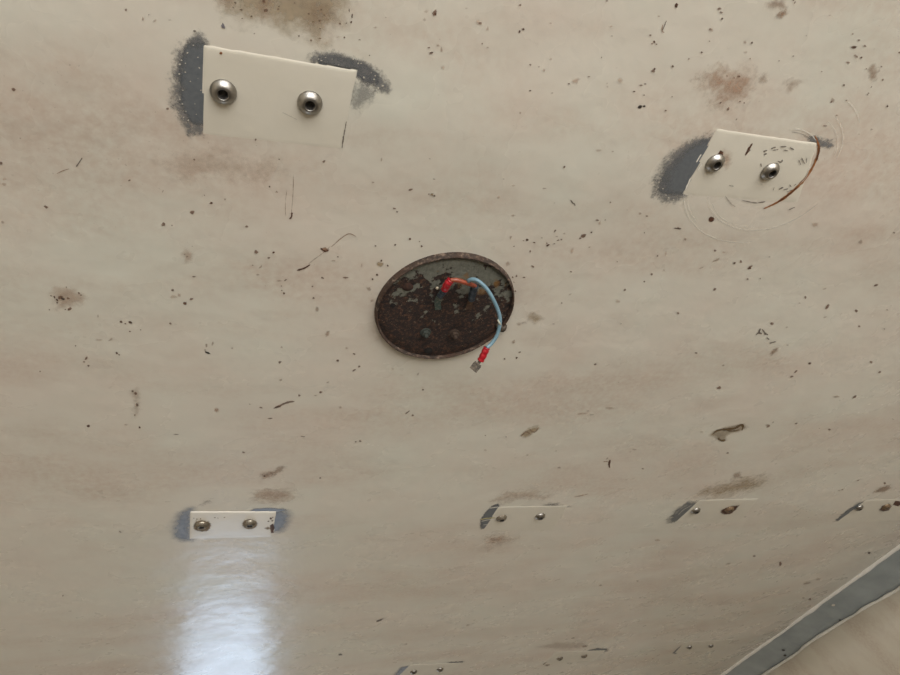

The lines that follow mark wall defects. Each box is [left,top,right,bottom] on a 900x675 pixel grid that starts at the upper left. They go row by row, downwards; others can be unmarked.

water stain [233,0,333,41]
peeling [172,35,207,136]
peeling [311,52,389,93]
peeling [652,137,711,201]